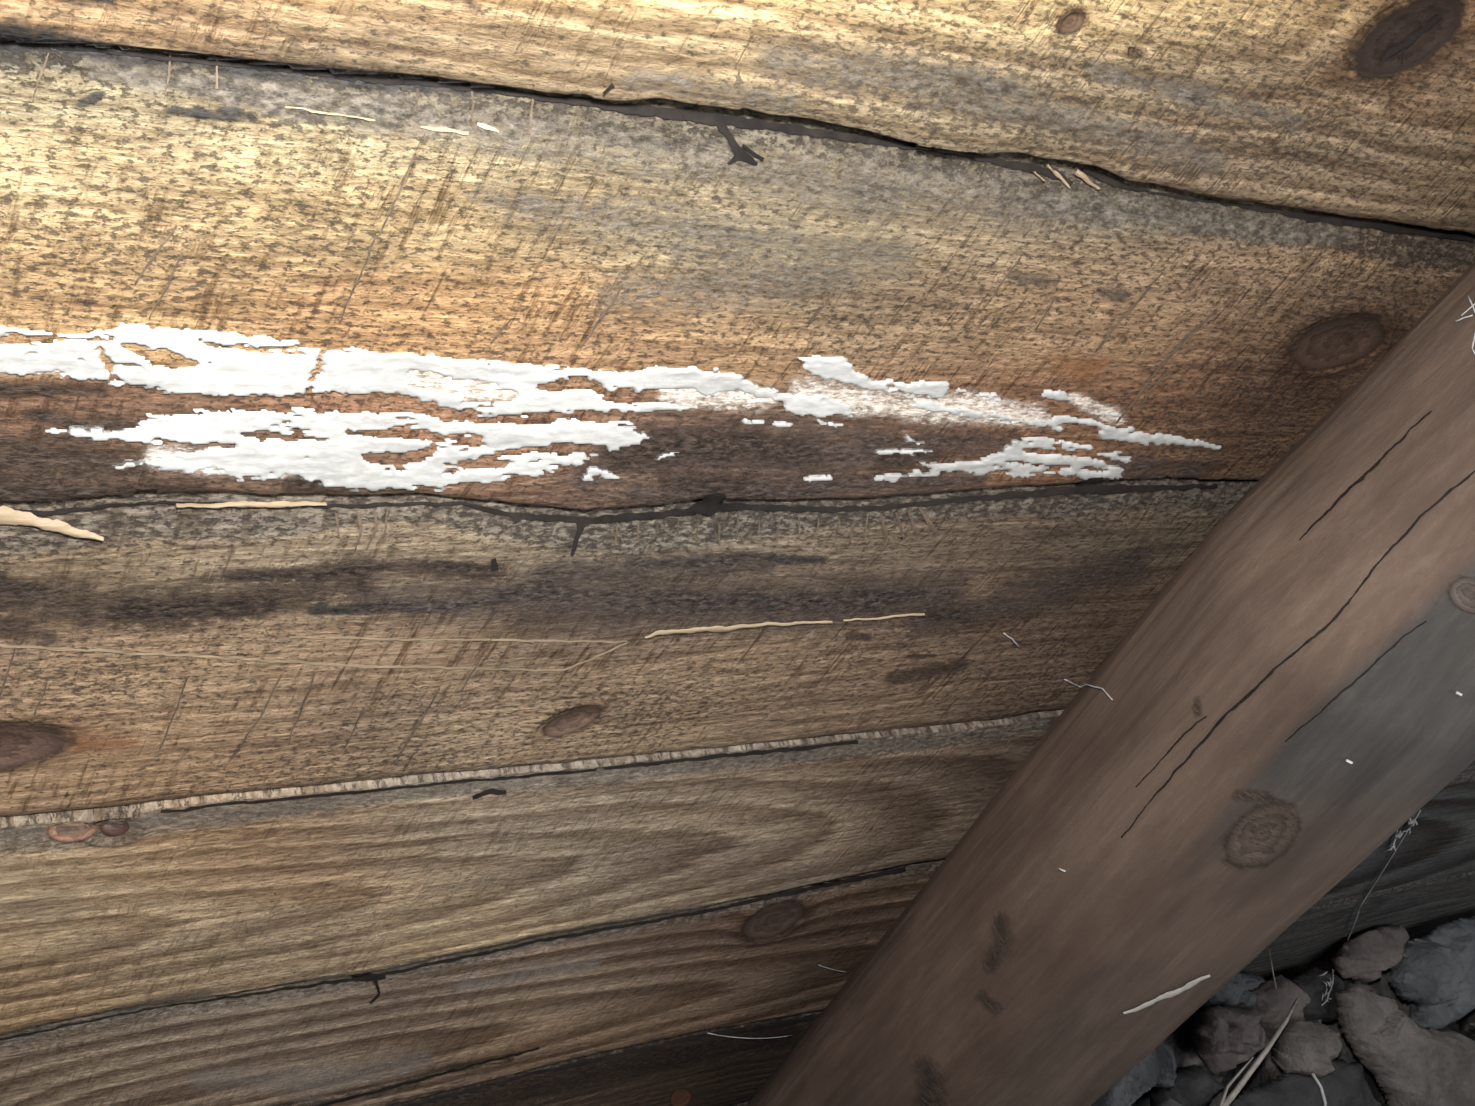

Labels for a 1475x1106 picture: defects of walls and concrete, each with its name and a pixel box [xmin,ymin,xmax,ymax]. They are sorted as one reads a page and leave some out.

peeling [0,322,1222,492]